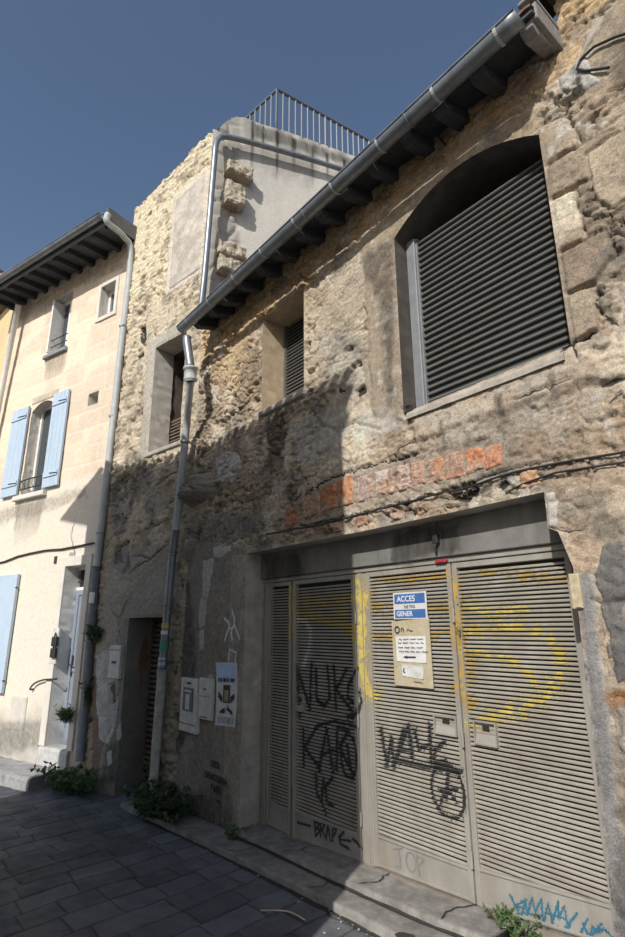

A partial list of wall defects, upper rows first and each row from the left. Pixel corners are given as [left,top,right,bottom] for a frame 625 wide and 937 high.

crack [561,295,619,358]
crack [514,379,570,400]
peeling [92,648,122,771]